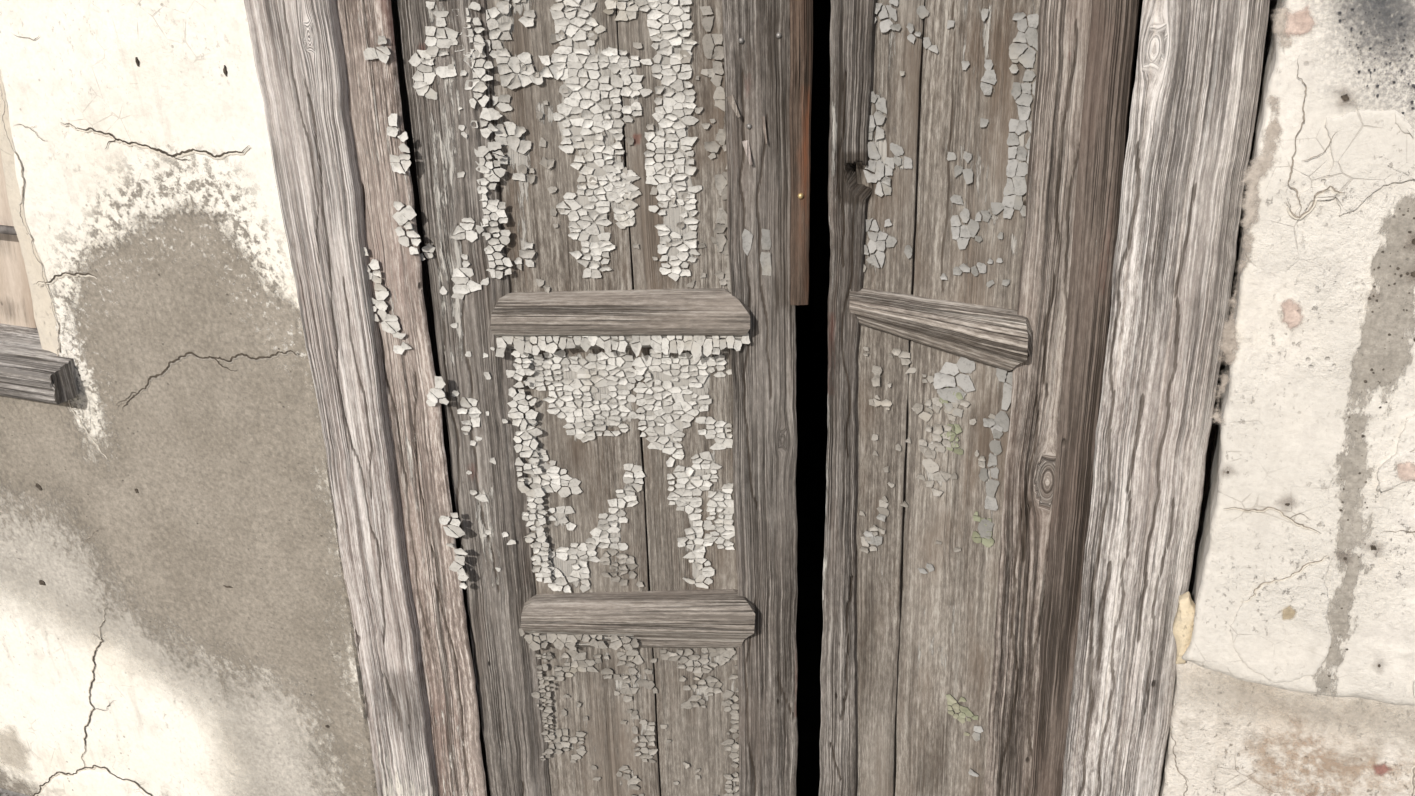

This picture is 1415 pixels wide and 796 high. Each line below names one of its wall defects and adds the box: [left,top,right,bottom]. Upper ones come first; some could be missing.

crack [0,85,251,356]
spalling [1239,96,1281,272]
crack [1286,59,1345,220]
peeling [1295,109,1415,217]
crack [68,400,107,459]
crack [118,350,301,411]
spalling [1212,291,1239,423]
spalling [1282,299,1303,328]
damp [1312,194,1415,698]
peeling [1376,413,1415,492]
peeling [1229,558,1331,683]
crack [33,607,152,796]